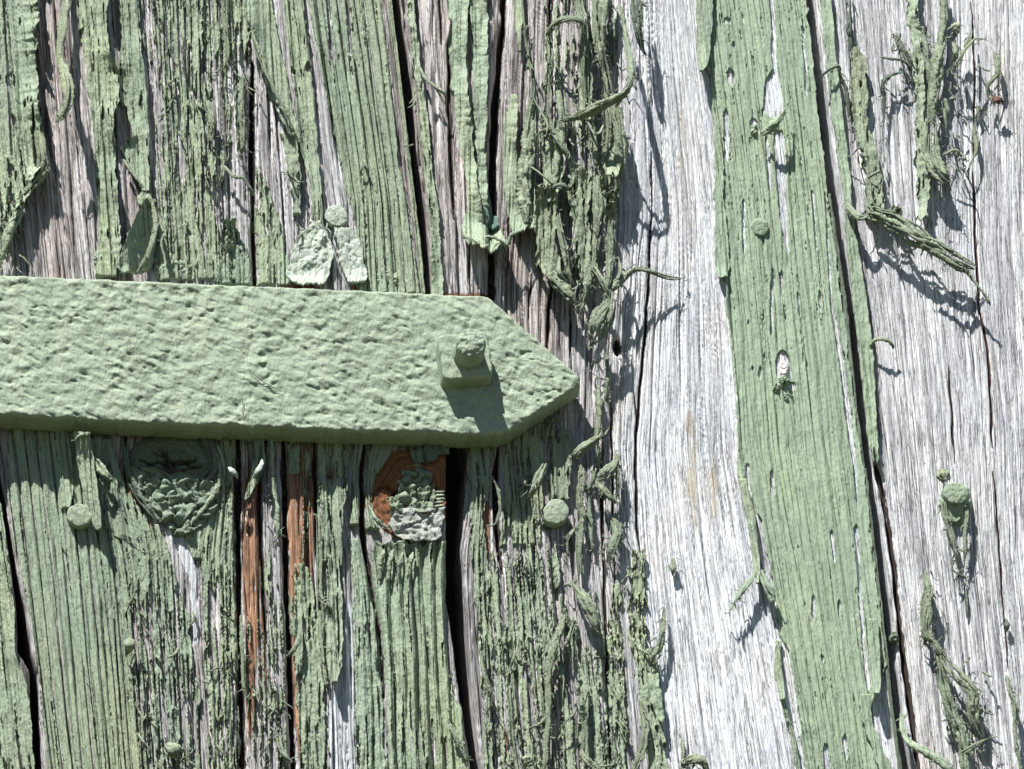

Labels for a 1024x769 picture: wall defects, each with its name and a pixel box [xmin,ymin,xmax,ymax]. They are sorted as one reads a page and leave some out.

crack [488,0,506,215]
crack [547,0,555,96]
crack [468,245,496,302]
peeling [0,0,709,769]
peeling [696,0,1024,769]